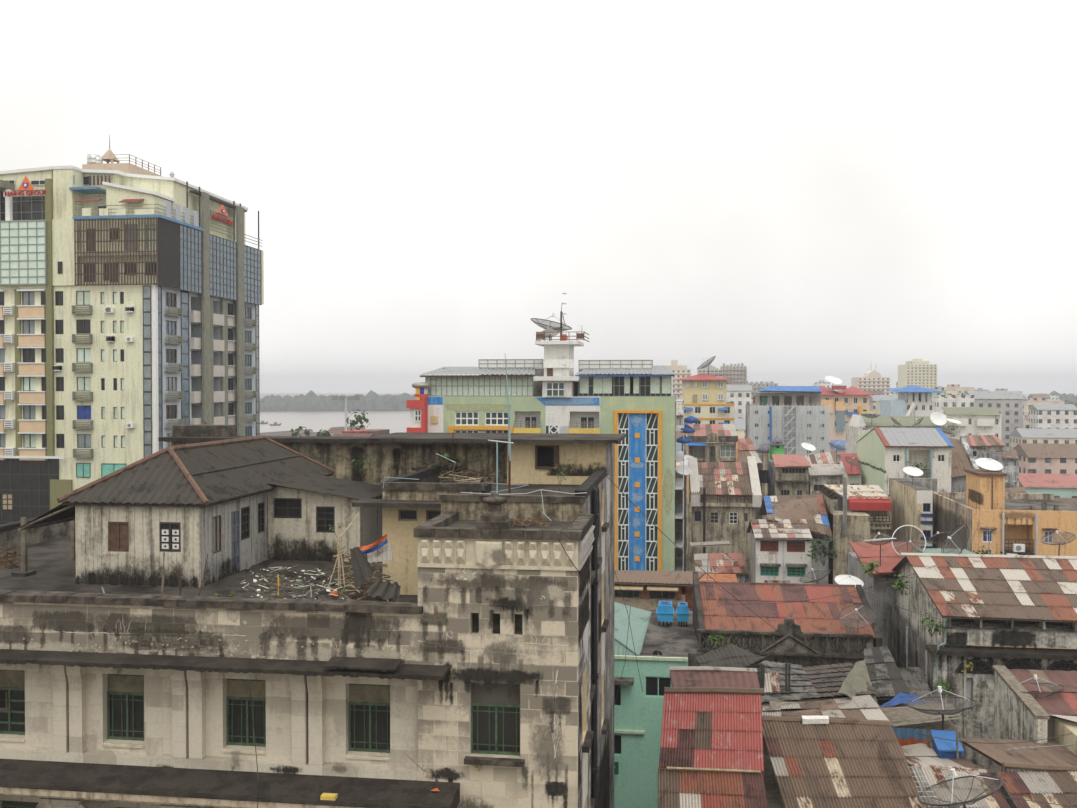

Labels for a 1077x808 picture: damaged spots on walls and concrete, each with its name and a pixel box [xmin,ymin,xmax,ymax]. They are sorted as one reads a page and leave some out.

leakage [0,611,246,657]
leakage [261,612,400,660]
leakage [418,463,611,808]